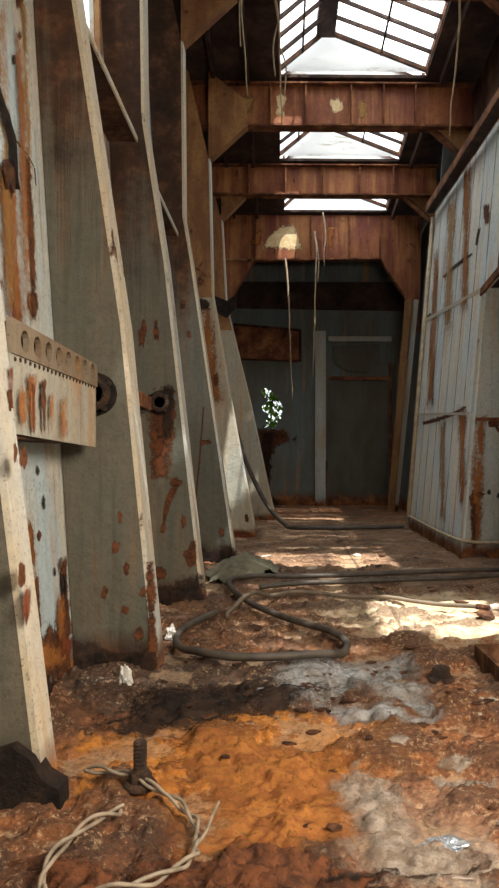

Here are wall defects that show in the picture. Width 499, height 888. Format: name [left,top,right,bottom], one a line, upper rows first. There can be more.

rust [0,4,38,322]
peeling [276,94,286,116]
peeling [329,98,343,114]
rust [8,367,67,437]
rust [147,386,183,533]
rust [199,298,221,402]
peeling [250,225,302,250]
rust [427,164,472,407]
rust [422,407,499,549]
rust [18,520,42,630]
rust [57,514,252,671]
rust [8,670,401,888]